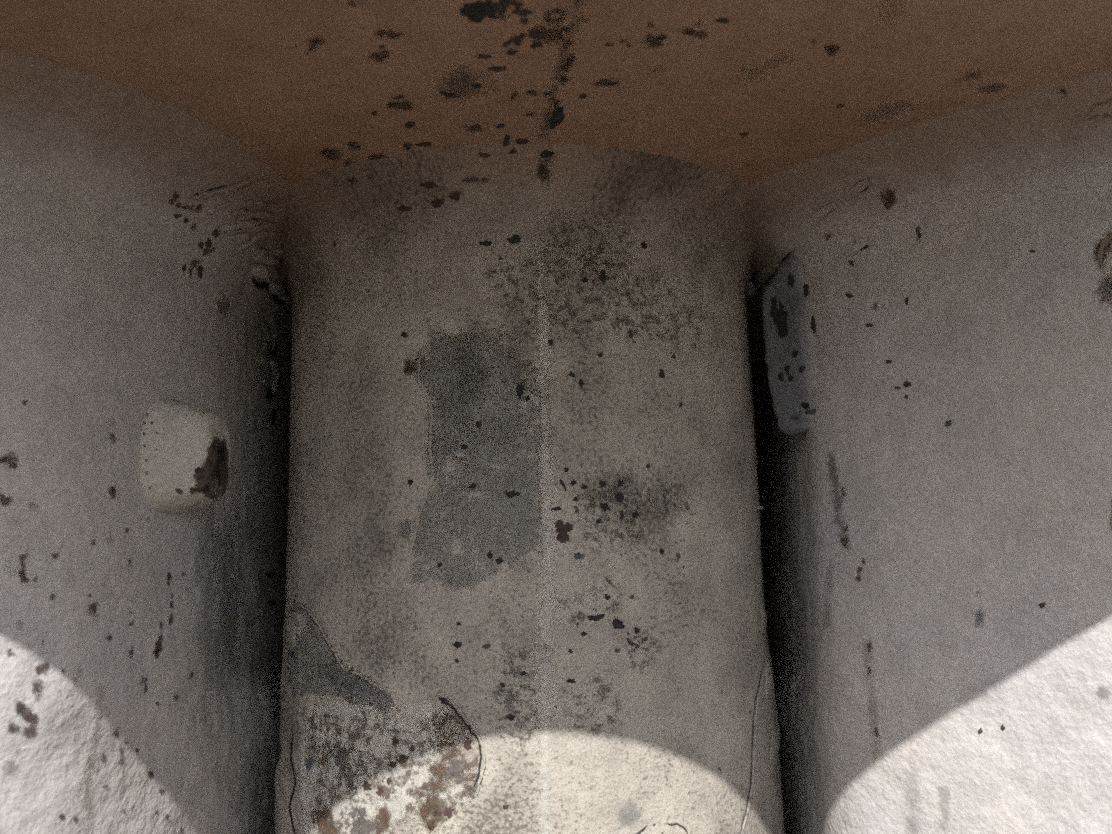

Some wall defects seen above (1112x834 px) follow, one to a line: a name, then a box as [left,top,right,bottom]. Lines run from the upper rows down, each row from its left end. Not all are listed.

spalling [176,437,229,500]
damp [490,223,701,543]
damp [1095,234,1112,304]
spalling [288,600,486,834]
damp [496,503,660,834]
crack [740,662,766,834]